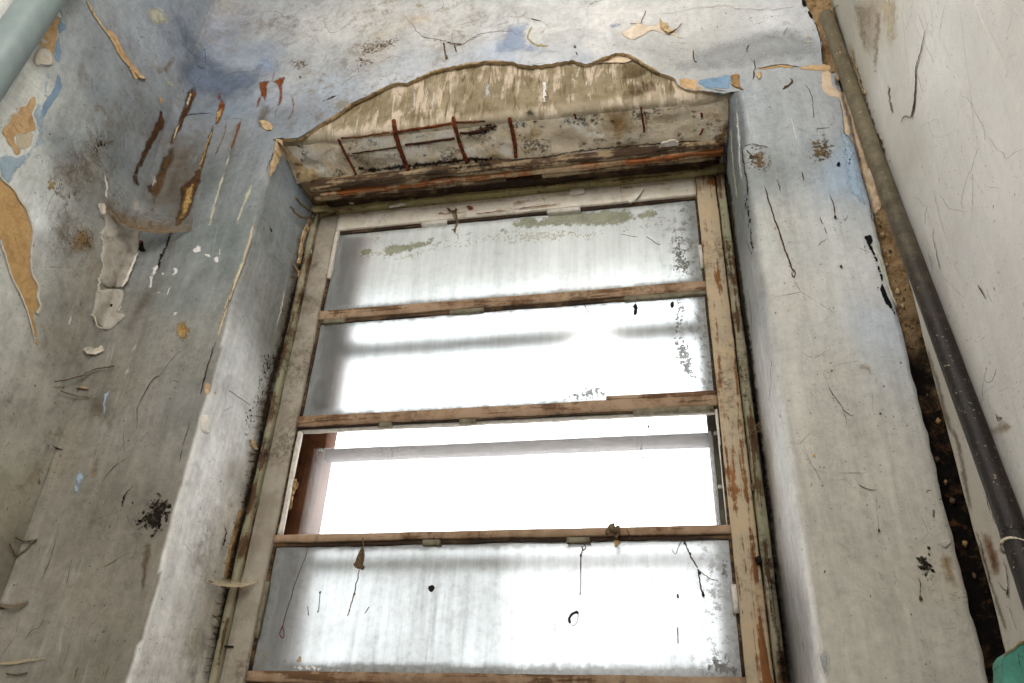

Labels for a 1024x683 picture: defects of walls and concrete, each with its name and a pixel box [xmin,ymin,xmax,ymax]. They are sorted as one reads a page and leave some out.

peeling [0,10,66,345]
peeling [87,0,146,79]
rust [133,87,196,225]
rust [158,93,241,269]
rust [257,72,294,118]
rust [343,152,502,173]
spalling [259,53,754,254]
crack [765,188,796,277]
crack [901,6,939,127]
water stain [126,493,171,583]